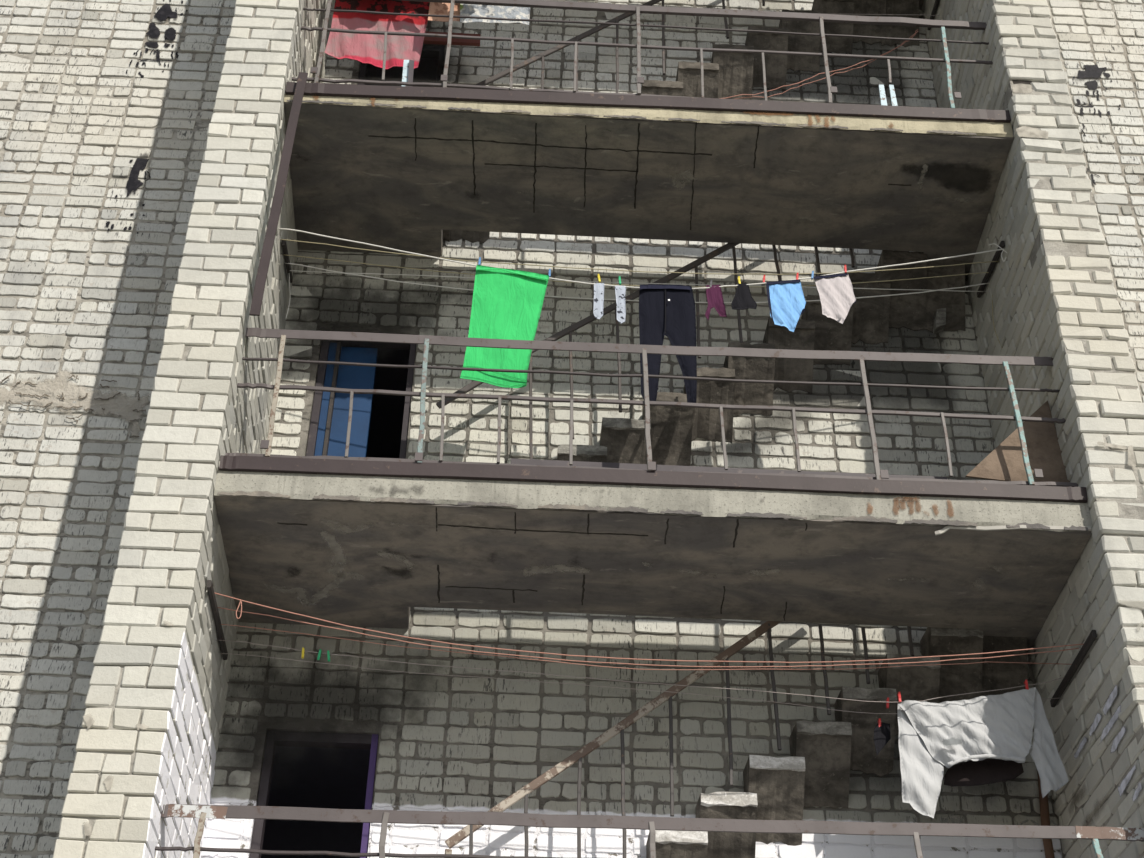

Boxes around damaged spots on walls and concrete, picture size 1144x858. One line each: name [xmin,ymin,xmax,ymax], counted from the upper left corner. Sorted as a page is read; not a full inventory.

leakage [904,164,990,192]
spalling [0,371,149,438]
corrosion [893,497,953,516]